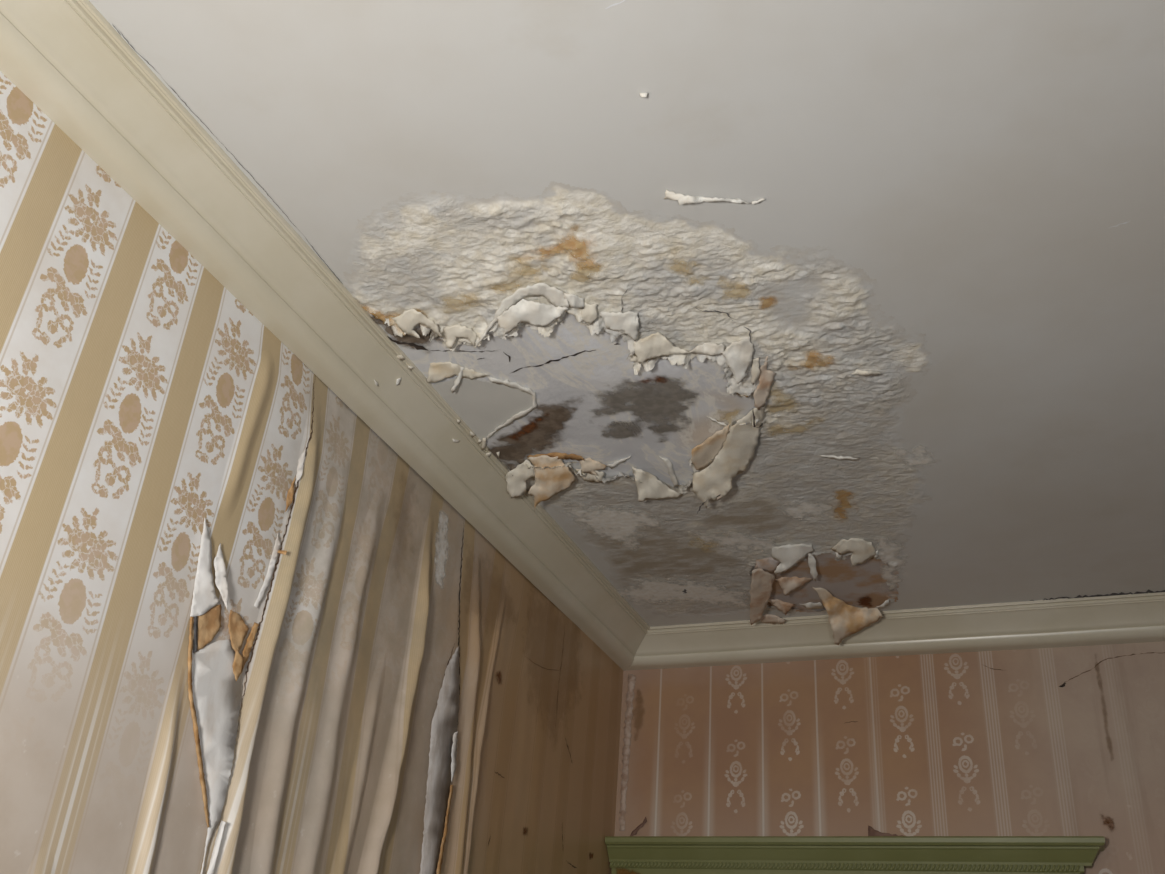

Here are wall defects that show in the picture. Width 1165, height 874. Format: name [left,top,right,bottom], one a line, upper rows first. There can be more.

damp [485,401,576,476]
peeling [368,283,776,514]
damp [594,376,698,442]
damp [566,503,660,548]
damp [618,580,748,607]
peeling [749,538,899,645]
flaking render [193,604,249,653]
crack [1059,652,1165,687]